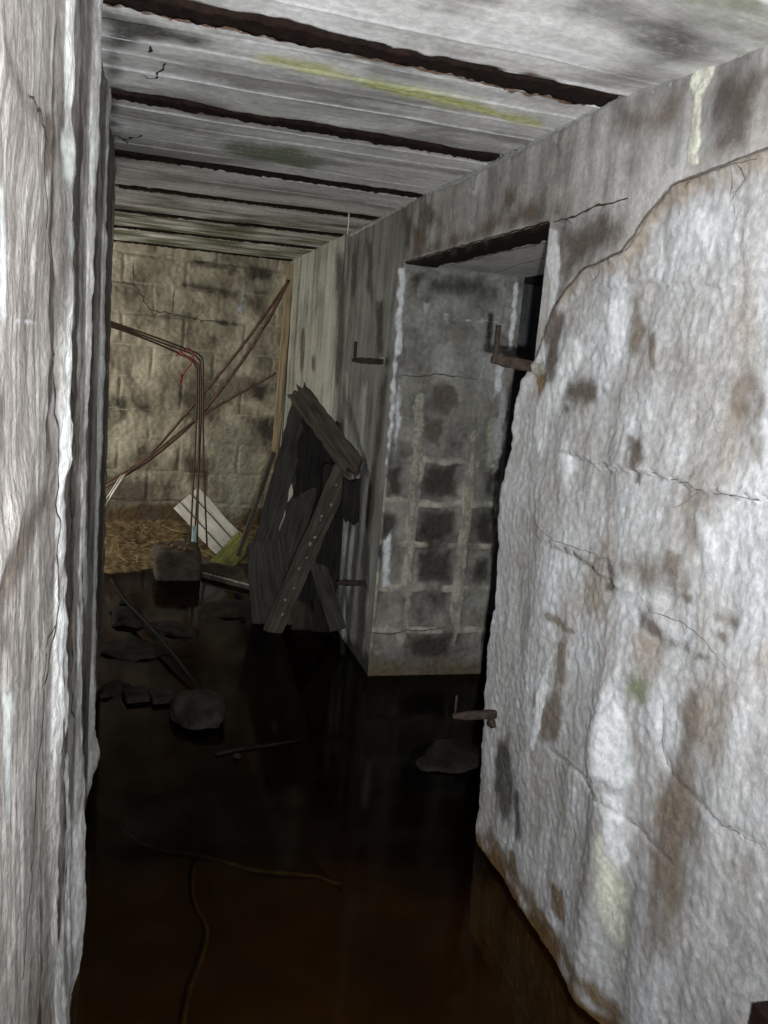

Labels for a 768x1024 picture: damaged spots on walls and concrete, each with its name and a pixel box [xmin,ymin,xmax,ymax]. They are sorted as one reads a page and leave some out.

leakage [656,66,760,166]
crack [553,198,628,224]
crack [590,158,757,282]
crack [116,267,233,324]
leakage [533,217,621,490]
leakage [602,291,655,366]
leakage [338,268,518,650]
leakage [629,437,643,484]
crack [630,469,768,508]
leakage [693,504,731,570]
leakage [641,608,674,644]
leakage [529,614,575,751]